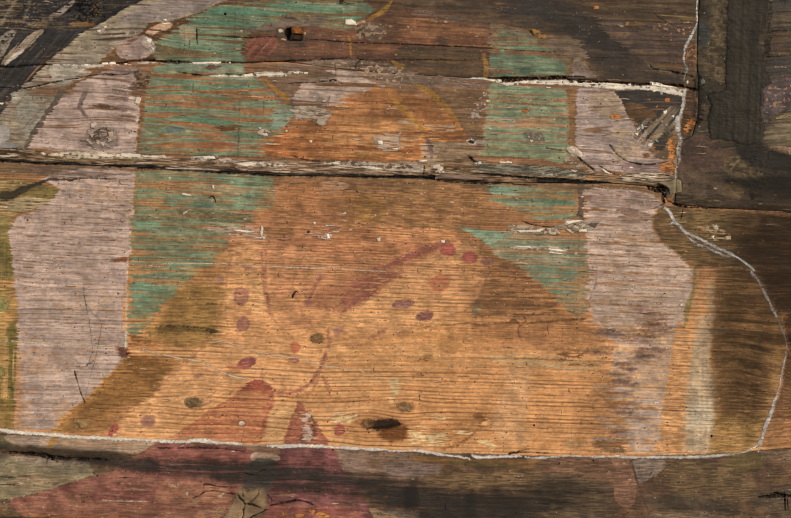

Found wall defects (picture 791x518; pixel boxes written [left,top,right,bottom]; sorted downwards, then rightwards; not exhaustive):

spalling [345,19,387,40]
peeling [289,98,332,126]
peeling [315,60,697,183]
crack [0,159,71,167]
crack [119,156,319,177]
crack [349,144,717,220]
peeling [507,210,598,235]
peeling [510,245,569,254]
crack [194,484,313,518]
crack [759,492,791,501]